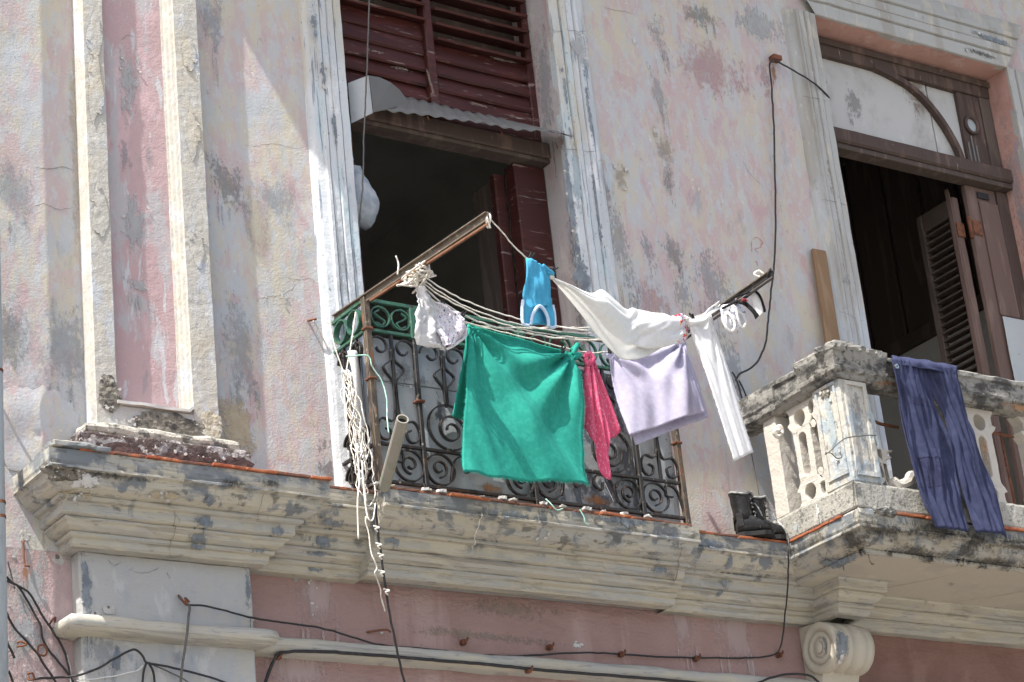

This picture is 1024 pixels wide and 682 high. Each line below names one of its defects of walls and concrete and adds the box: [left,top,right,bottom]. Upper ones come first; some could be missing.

peeling [86,11,104,125]
peeling [91,182,109,238]
spalling [99,374,123,413]
peeling [819,384,840,463]
peeling [100,442,255,468]
spalling [40,464,110,502]
peeling [819,553,860,572]